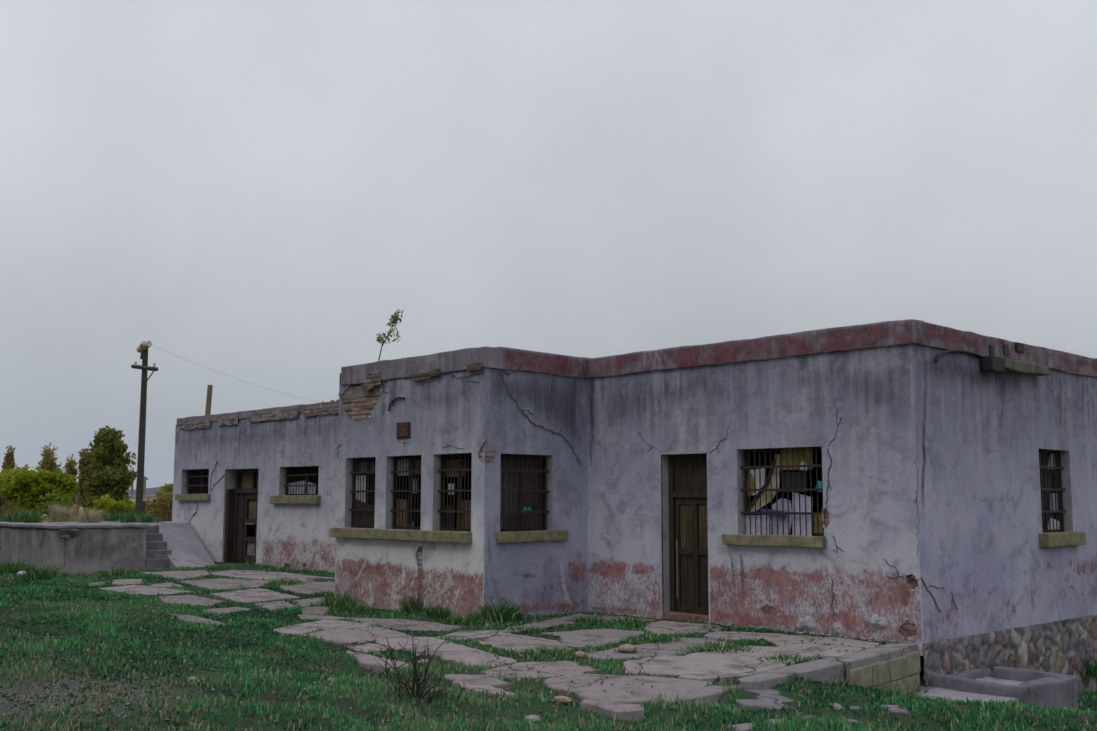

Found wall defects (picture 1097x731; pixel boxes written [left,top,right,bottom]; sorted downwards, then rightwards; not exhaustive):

crack [190,461,226,521]
spalling [179,370,383,430]
spalling [475,440,496,466]
crack [446,370,582,467]
crack [826,400,842,507]
peeling [263,537,509,616]
peeling [521,556,661,618]
peeling [710,566,922,643]
crack [830,535,845,622]